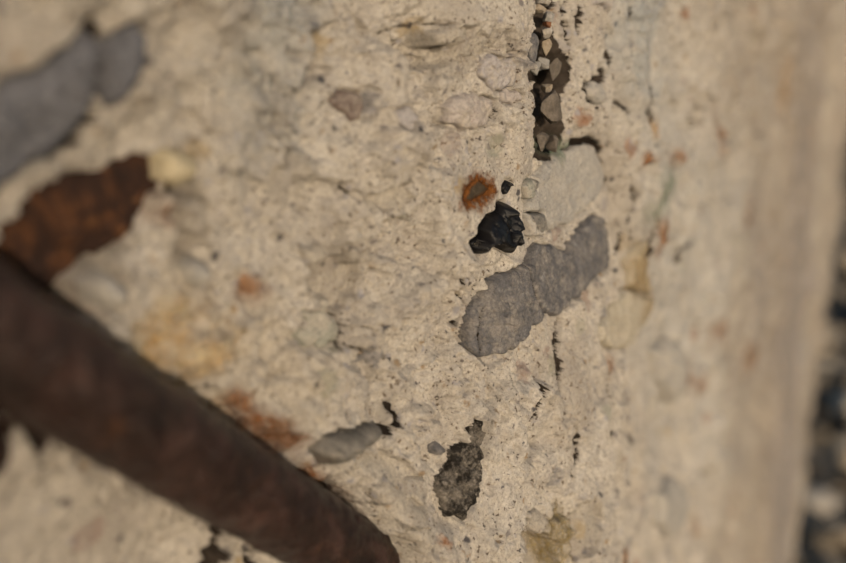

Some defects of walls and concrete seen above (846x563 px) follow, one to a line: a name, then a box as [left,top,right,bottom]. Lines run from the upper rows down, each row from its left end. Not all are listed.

crack [527,0,655,188]
corrosion [459,172,497,212]
crack [613,186,656,257]
spalling [40,228,135,314]
corrosion [0,152,400,563]
crack [198,526,254,563]